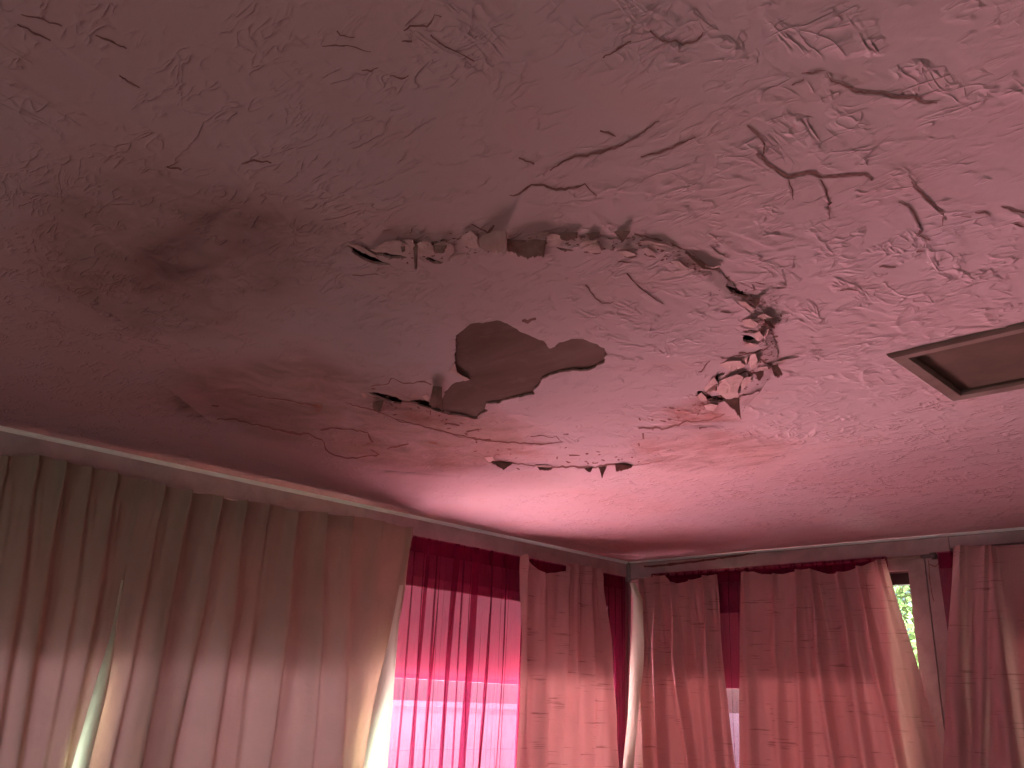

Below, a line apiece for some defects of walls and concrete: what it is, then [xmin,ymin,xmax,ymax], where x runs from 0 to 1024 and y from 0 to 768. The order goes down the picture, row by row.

crack [792,70,937,106]
crack [509,121,696,197]
crack [746,125,873,219]
flaking render [422,320,606,418]